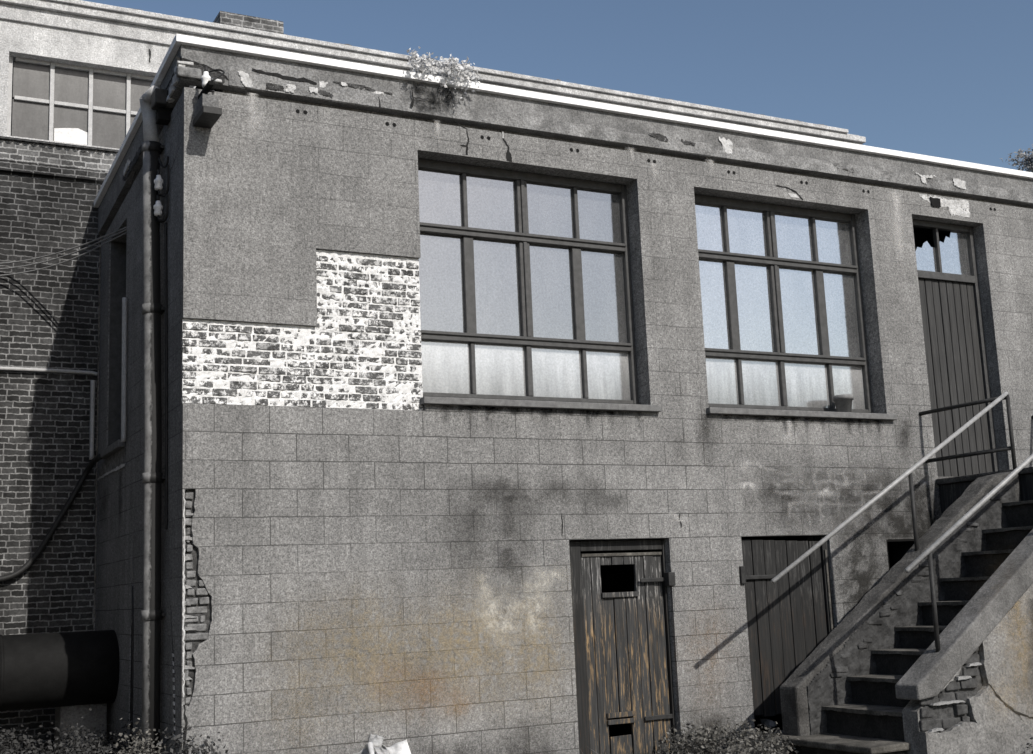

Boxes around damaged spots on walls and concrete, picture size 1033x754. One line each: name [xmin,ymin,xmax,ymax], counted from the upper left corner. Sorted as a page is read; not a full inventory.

spalling [166,56,253,103]
spalling [266,83,296,93]
spalling [309,81,393,97]
spalling [913,170,970,217]
peeling [181,250,423,411]
spalling [182,489,211,706]
damp [482,602,540,633]
spalling [807,485,1017,735]